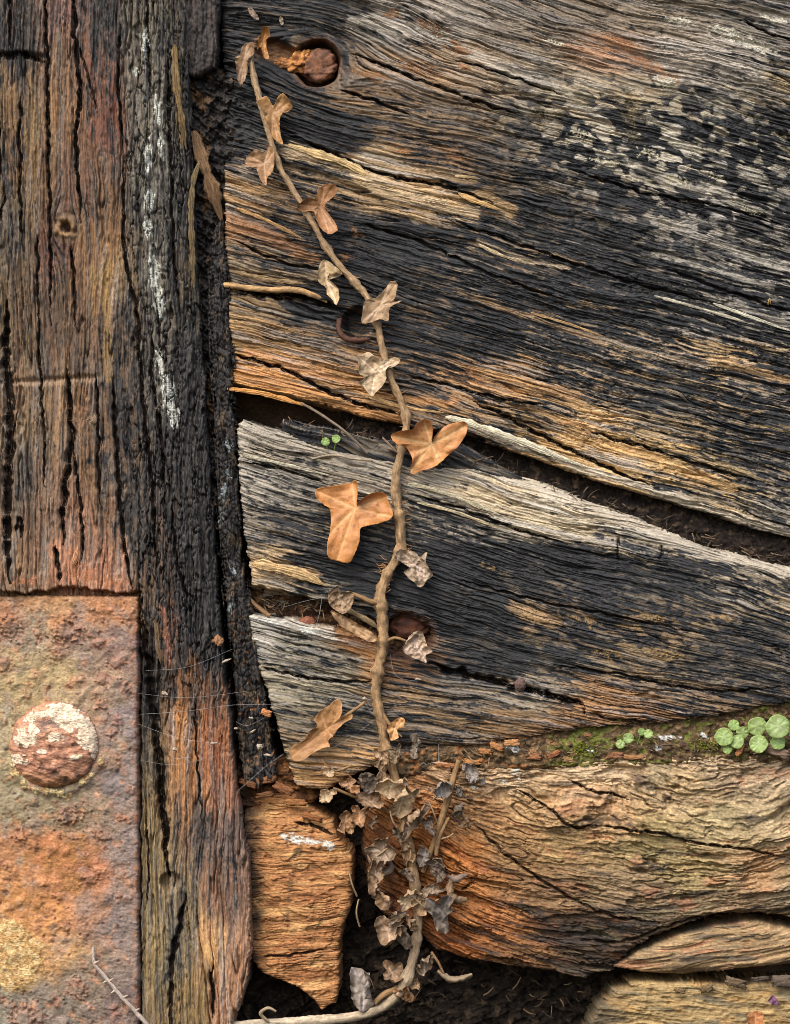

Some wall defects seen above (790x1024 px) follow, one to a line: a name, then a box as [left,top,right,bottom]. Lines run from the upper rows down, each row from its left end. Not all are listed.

crack [0,0,192,1024]
crack [568,779,629,800]
crack [519,790,790,860]
corrosion [1,833,92,917]
crack [474,823,750,944]